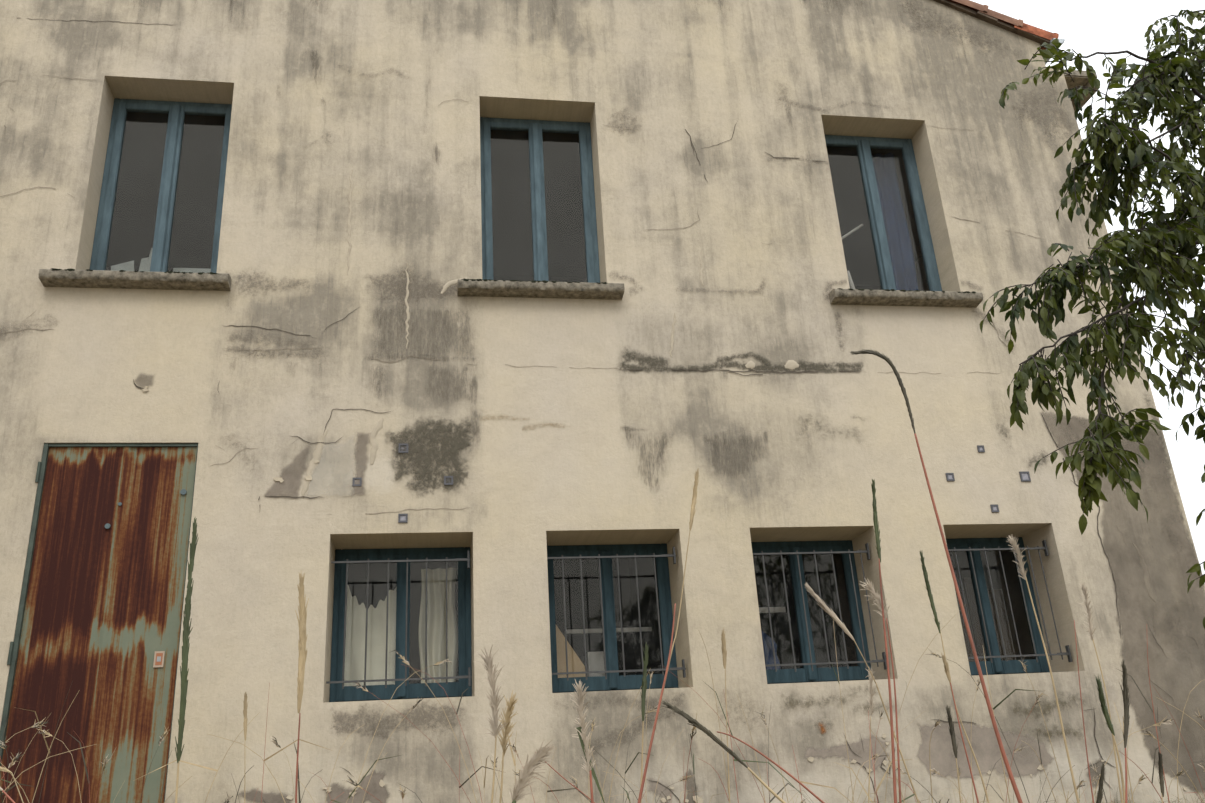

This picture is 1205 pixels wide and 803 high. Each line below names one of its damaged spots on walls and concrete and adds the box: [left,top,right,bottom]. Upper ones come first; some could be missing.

crack [647,127,735,230]
crack [226,308,358,351]
peeling [265,447,319,497]
peeling [353,434,368,494]